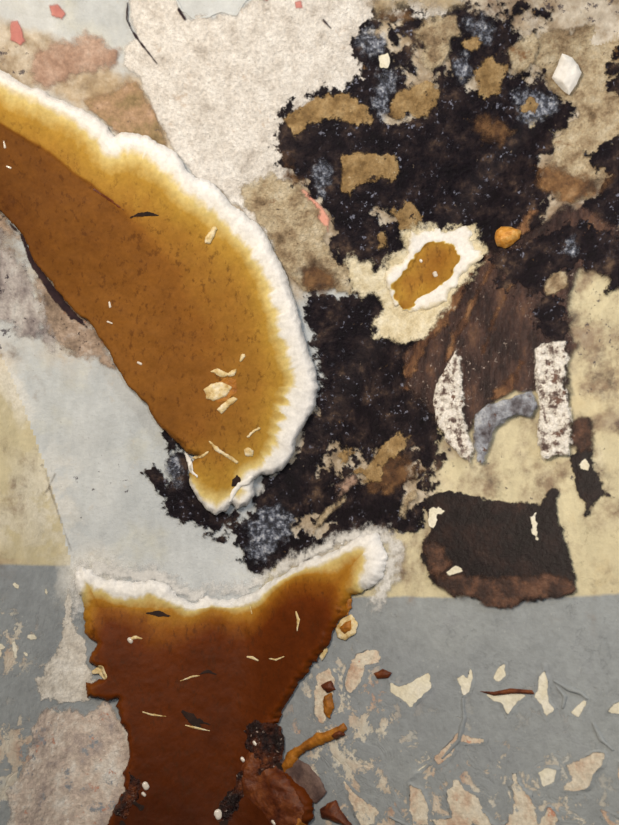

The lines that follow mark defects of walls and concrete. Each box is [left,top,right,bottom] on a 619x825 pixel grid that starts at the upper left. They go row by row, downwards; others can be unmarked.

flaking render [32,0,481,295]
leakage [0,229,55,352]
leakage [140,0,619,603]
peeling [433,341,572,464]
peeling [0,641,28,658]
flaking render [6,589,130,825]
peeling [311,646,384,727]
peeling [385,669,435,710]
peeling [454,651,557,722]
peeling [280,759,327,803]
peeling [339,777,382,825]
peeling [406,749,608,825]